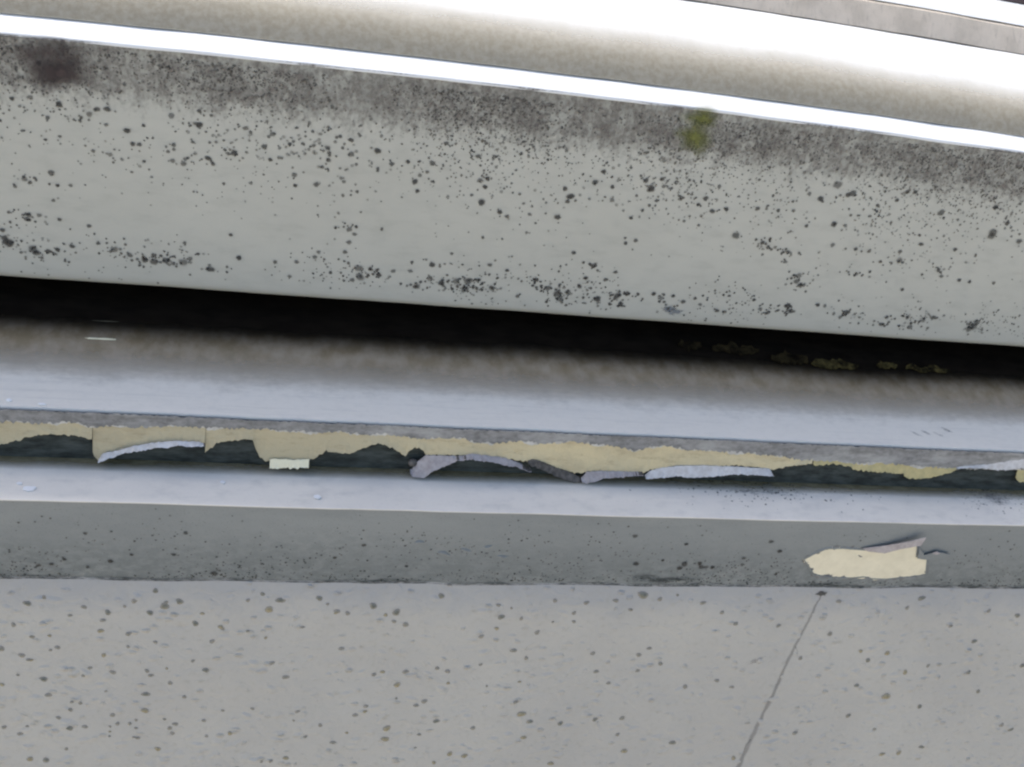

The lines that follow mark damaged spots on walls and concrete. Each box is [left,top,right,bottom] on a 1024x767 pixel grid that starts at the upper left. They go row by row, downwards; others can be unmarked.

water stain [0,33,1024,293]
water stain [290,213,802,325]
water stain [816,288,945,333]
water stain [965,301,1020,335]
peeling [0,398,1024,490]
peeling [802,537,950,581]